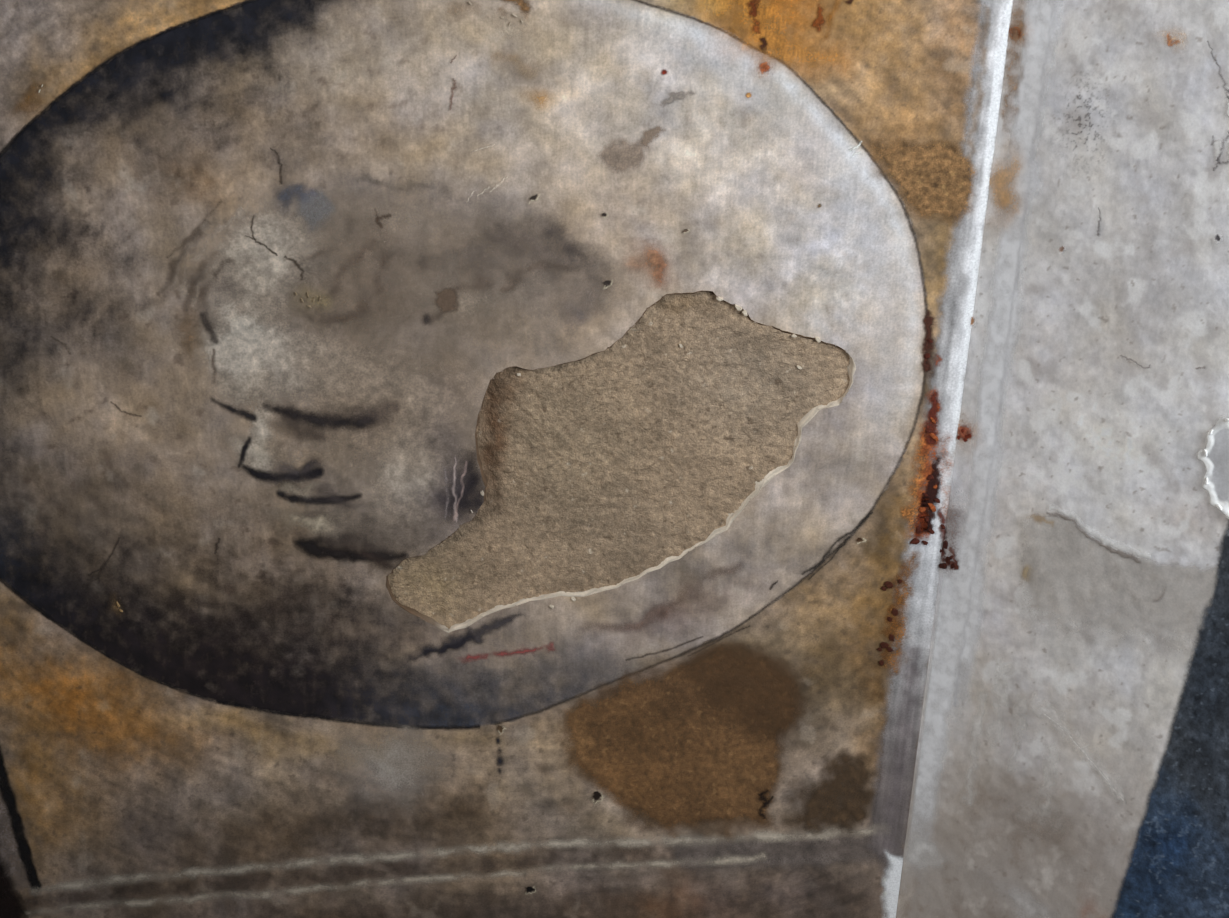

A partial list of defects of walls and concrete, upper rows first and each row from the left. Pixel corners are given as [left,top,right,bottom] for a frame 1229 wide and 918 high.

flaking render [386,291,856,633]
corrosion [877,310,973,673]